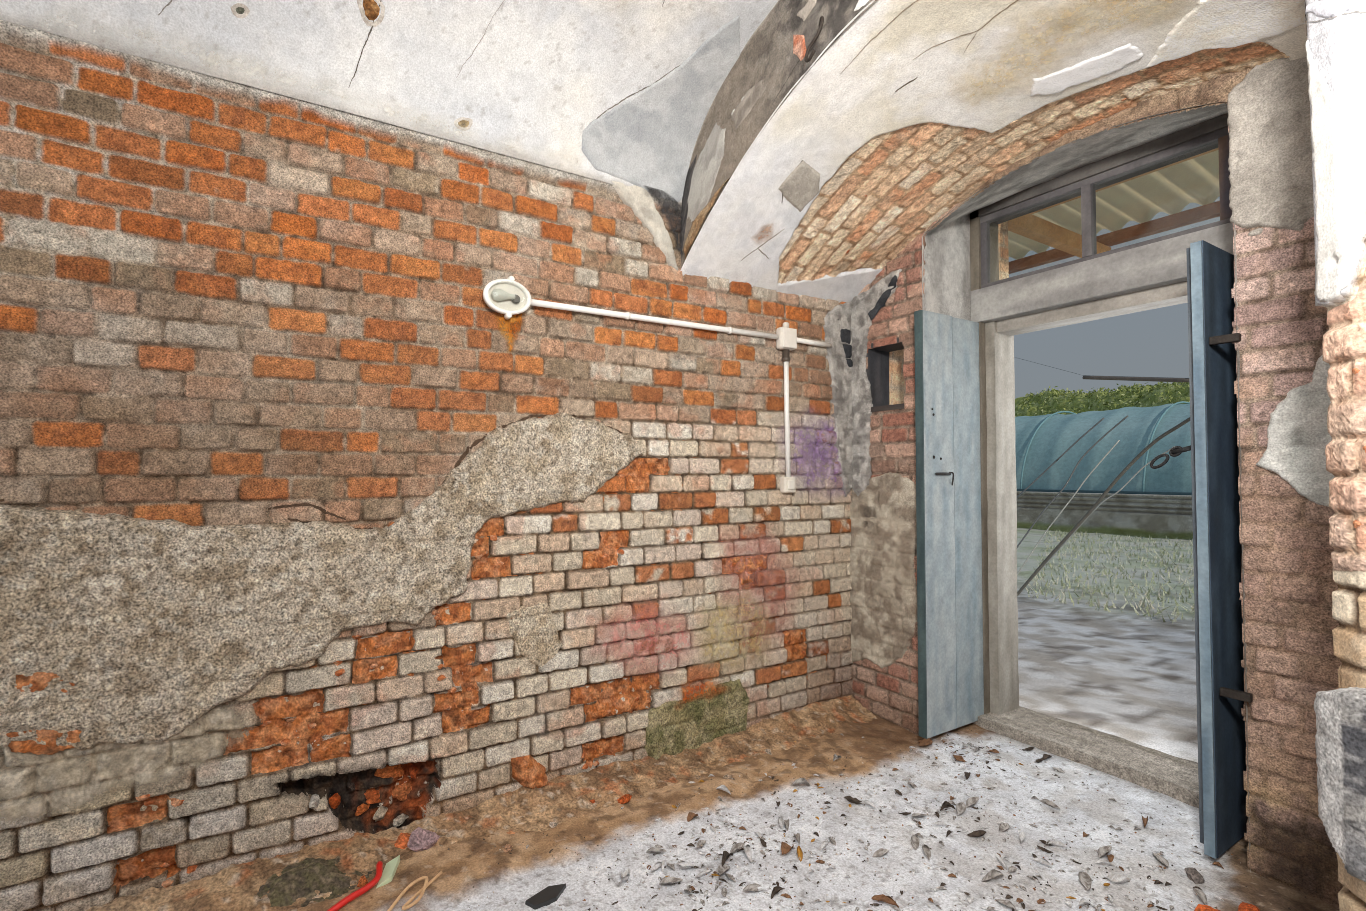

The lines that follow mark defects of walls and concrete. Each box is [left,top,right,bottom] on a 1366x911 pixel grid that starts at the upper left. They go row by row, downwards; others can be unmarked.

crack [349,0,381,87]
peeling [683,80,766,259]
flaking render [778,0,1366,572]
corrosion [498,313,522,351]
spalling [599,458,683,511]
spalling [471,517,542,580]
spalling [582,530,629,569]
spalling [432,599,485,627]
spalling [6,729,82,755]
spalling [223,629,493,834]
spalling [570,652,667,769]
spalling [111,845,198,894]